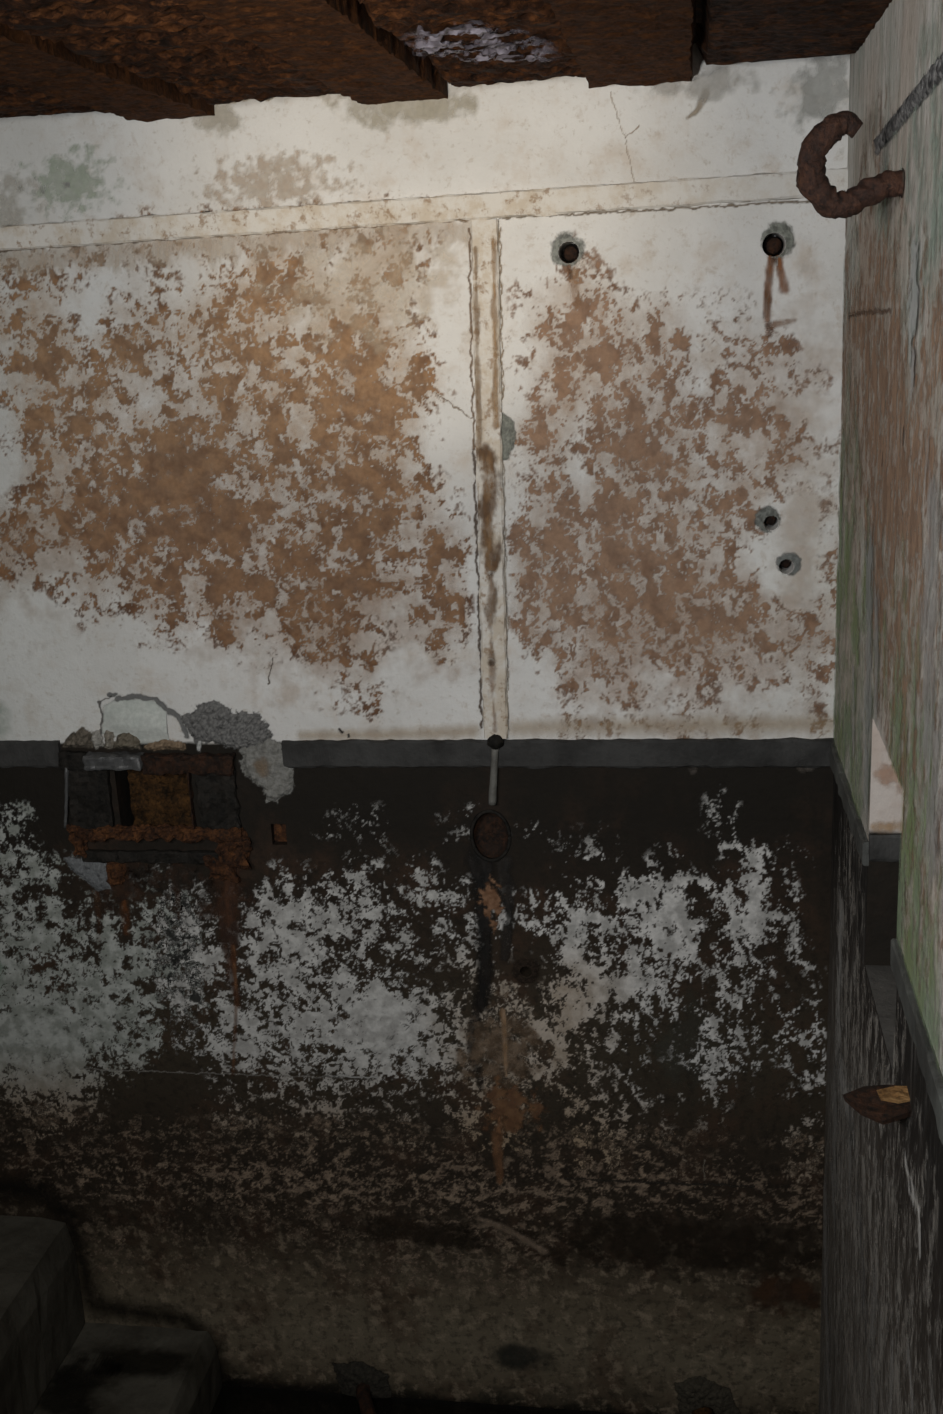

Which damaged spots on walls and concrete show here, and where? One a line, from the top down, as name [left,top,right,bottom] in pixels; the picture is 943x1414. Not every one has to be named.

corrosion [763,256,789,336]
peeling [0,225,474,722]
peeling [501,195,943,990]
spalling [62,700,294,803]
corrosion [96,850,255,1008]
damp [467,851,515,1081]